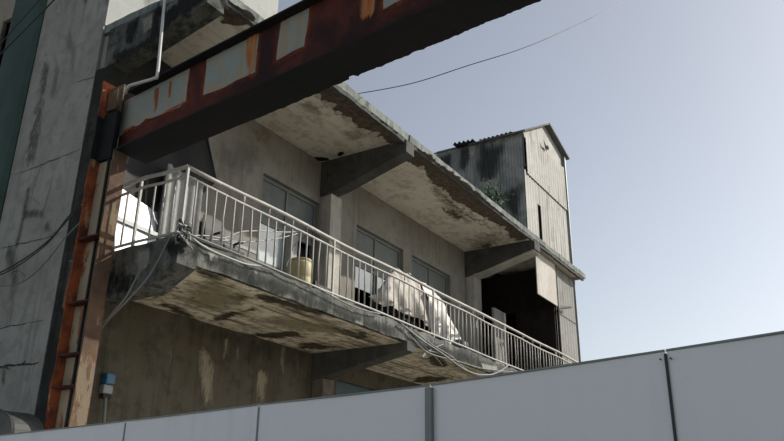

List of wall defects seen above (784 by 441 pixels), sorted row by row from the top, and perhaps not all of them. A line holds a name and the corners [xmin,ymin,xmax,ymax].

leakage [113,0,203,63]
corrosion [361,0,404,19]
corrosion [201,32,261,100]
corrosion [121,67,191,137]
spalling [314,88,399,145]
leakage [441,142,522,216]
leakage [165,239,184,256]
leakage [194,245,395,336]
crack [0,361,38,370]
leakage [427,340,497,372]